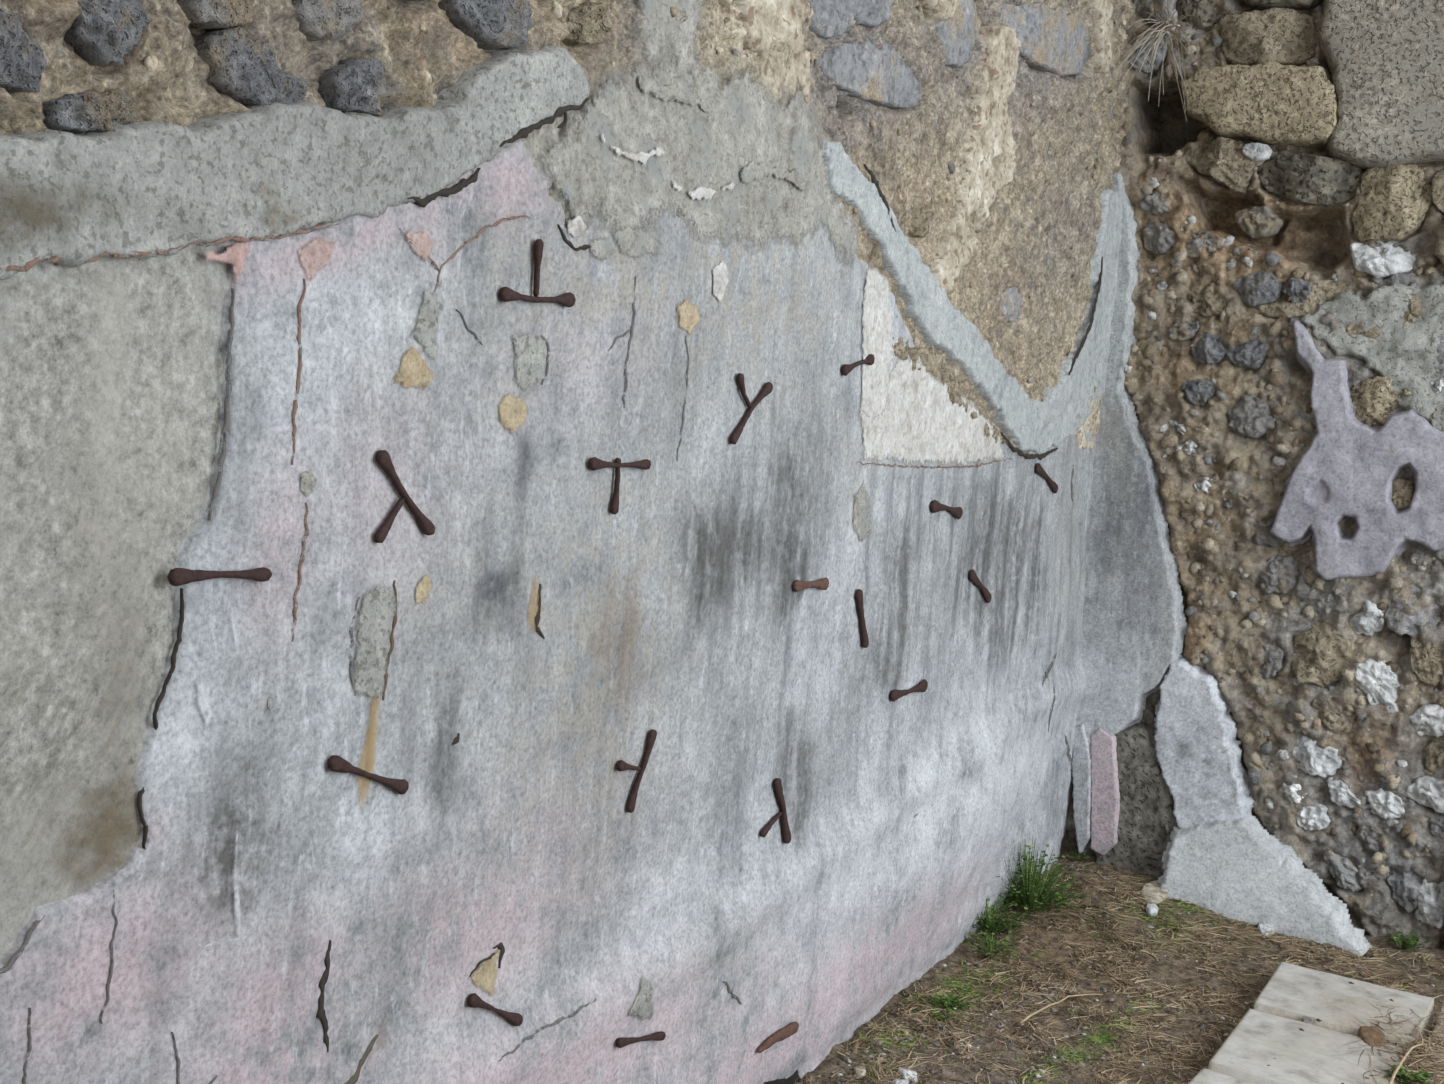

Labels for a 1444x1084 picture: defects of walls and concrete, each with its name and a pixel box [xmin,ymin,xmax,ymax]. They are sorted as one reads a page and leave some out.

flaking render [541,0,858,301]
flaking render [0,243,231,962]
crack [137,588,185,849]
peeling [1071,385,1187,880]
crack [316,940,379,1084]
crack [499,998,596,1061]